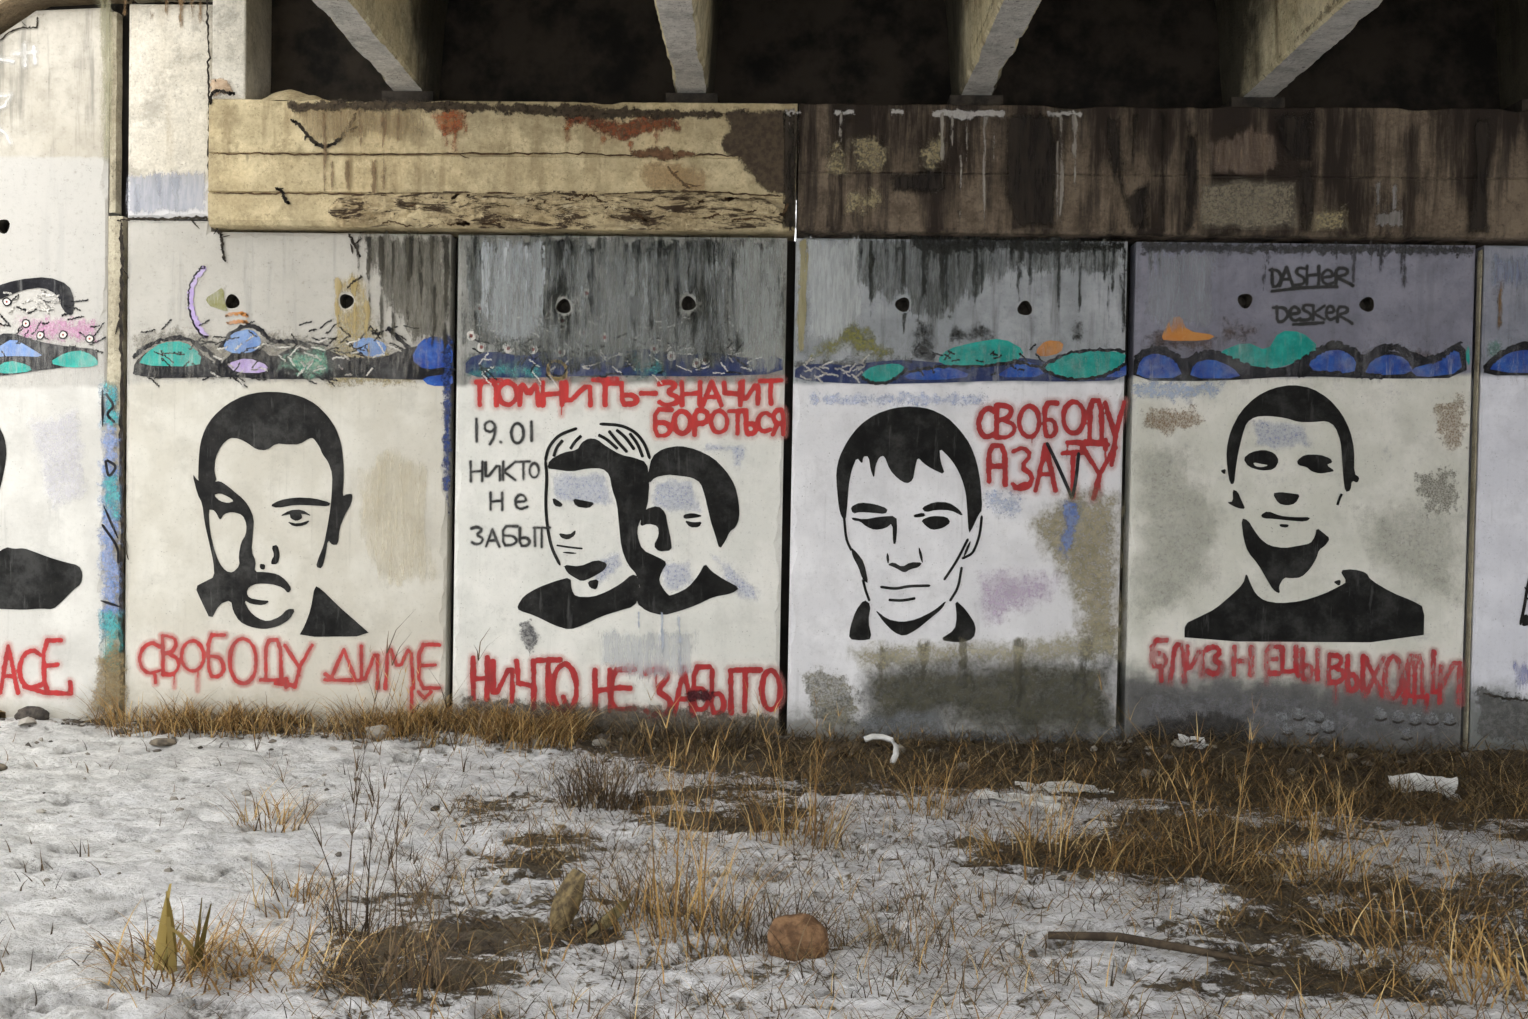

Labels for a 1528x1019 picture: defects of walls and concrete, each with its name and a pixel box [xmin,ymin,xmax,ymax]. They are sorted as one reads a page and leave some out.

corrosion [433,109,467,151]
corrosion [564,116,695,162]
leakage [287,97,1490,373]
leakage [860,637,1447,744]